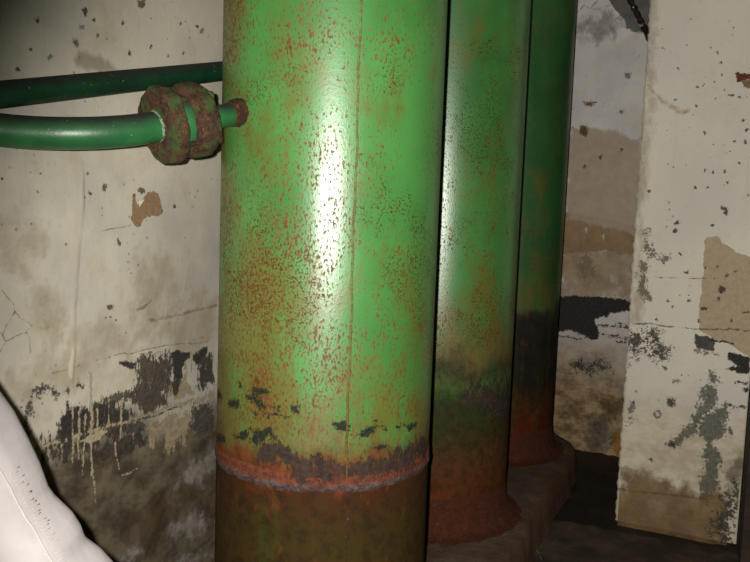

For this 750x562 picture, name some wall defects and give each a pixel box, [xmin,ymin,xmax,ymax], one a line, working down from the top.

peeling [131,188,163,227]
rust [218,207,325,348]
water stain [597,322,628,343]
peeling [699,236,750,357]
water stain [60,361,216,476]
water stain [617,472,725,544]